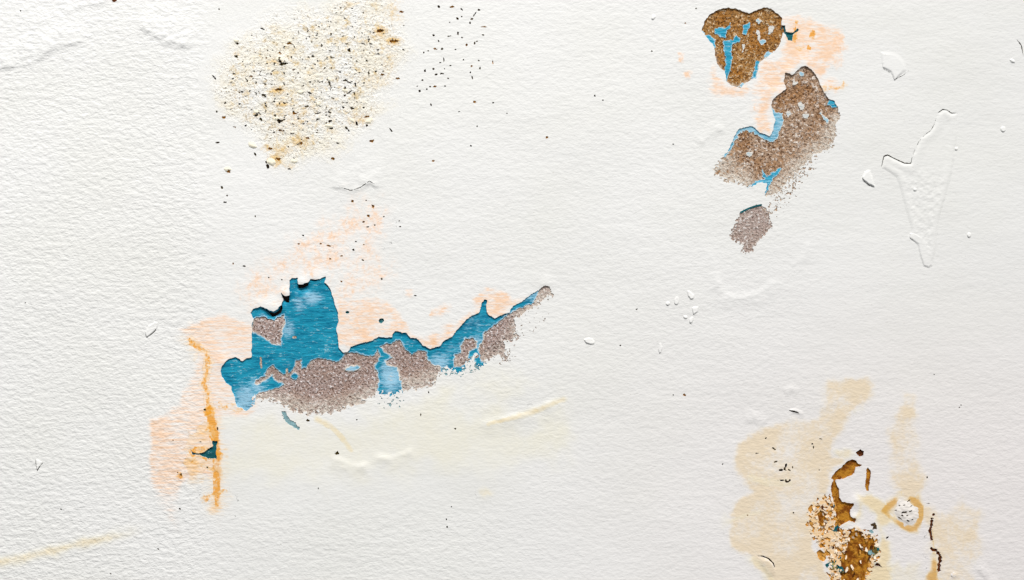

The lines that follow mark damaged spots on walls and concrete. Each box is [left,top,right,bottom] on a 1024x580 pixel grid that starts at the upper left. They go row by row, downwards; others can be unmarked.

peeling [702,8,798,88]
water stain [676,12,853,136]
peeling [713,66,841,254]
corrosion [164,314,249,531]
water stain [144,182,582,534]
peeling [221,277,554,430]
water stain [716,370,993,580]